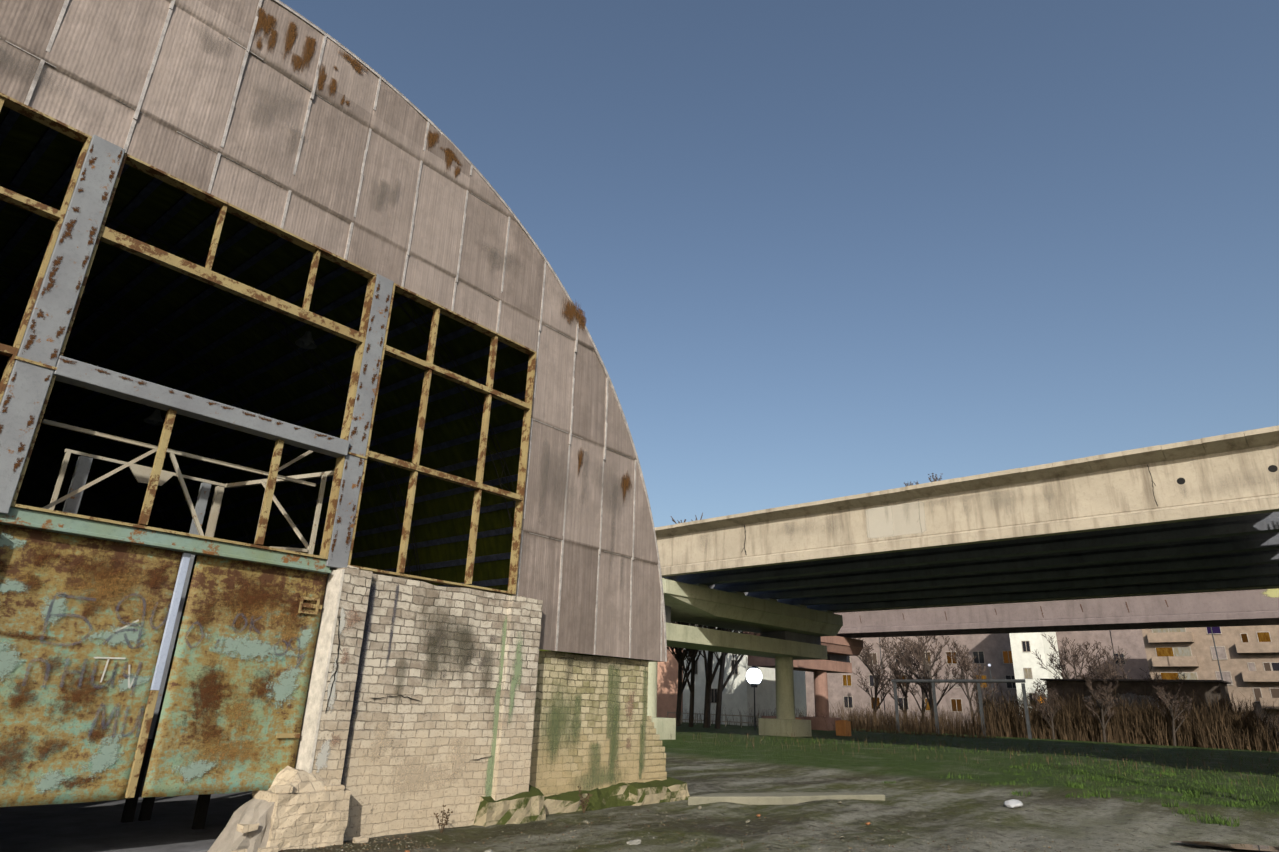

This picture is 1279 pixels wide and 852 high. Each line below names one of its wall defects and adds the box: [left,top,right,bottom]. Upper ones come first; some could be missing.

rust [254,8,368,105]
rust [22,145,98,354]
rust [50,308,77,364]
rust [562,301,586,330]
rust [24,544,169,616]
rust [0,733,68,777]
rust [3,656,111,720]
rust [56,776,101,790]
rust [82,716,111,741]
rust [182,663,281,773]
leakage [498,617,516,718]
leakage [591,666,618,780]